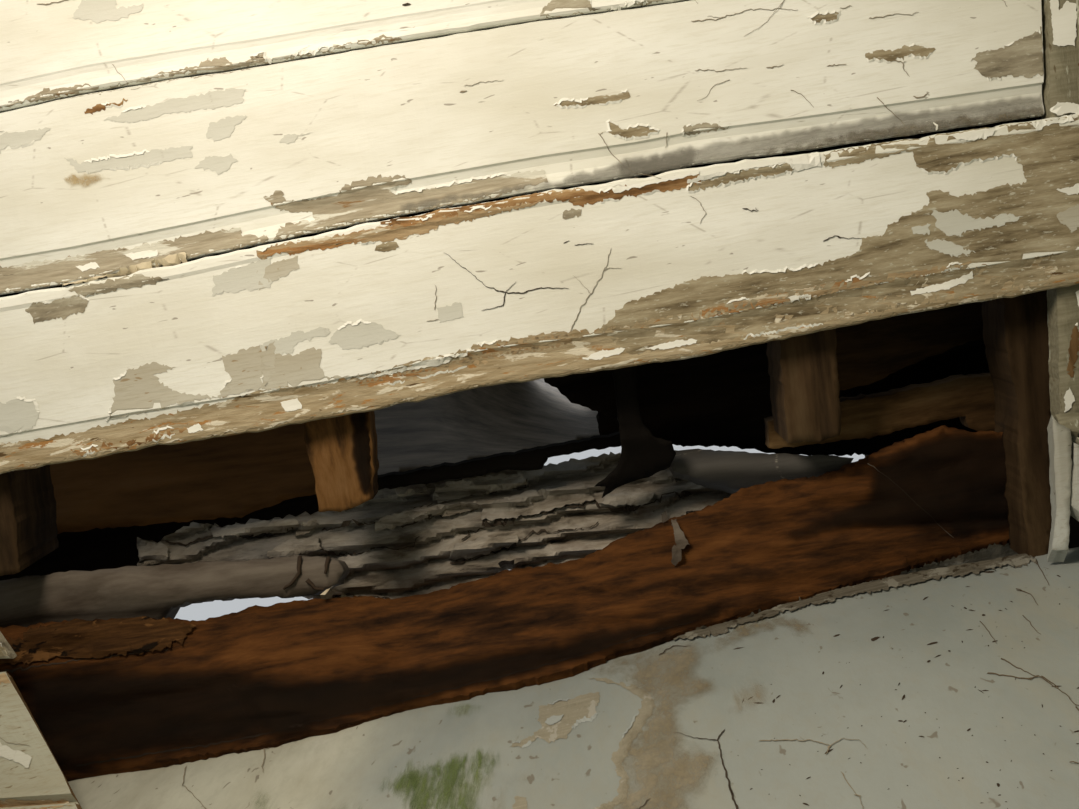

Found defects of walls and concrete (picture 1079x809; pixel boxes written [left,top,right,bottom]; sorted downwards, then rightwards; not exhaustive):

peeling [0,34,402,141]
peeling [554,89,630,109]
crack [692,8,796,22]
peeling [865,43,935,63]
peeling [971,26,1044,81]
crack [443,241,611,331]
peeling [0,102,1079,473]
peeling [0,799,72,809]
peeling [510,678,656,809]
crack [677,729,738,809]